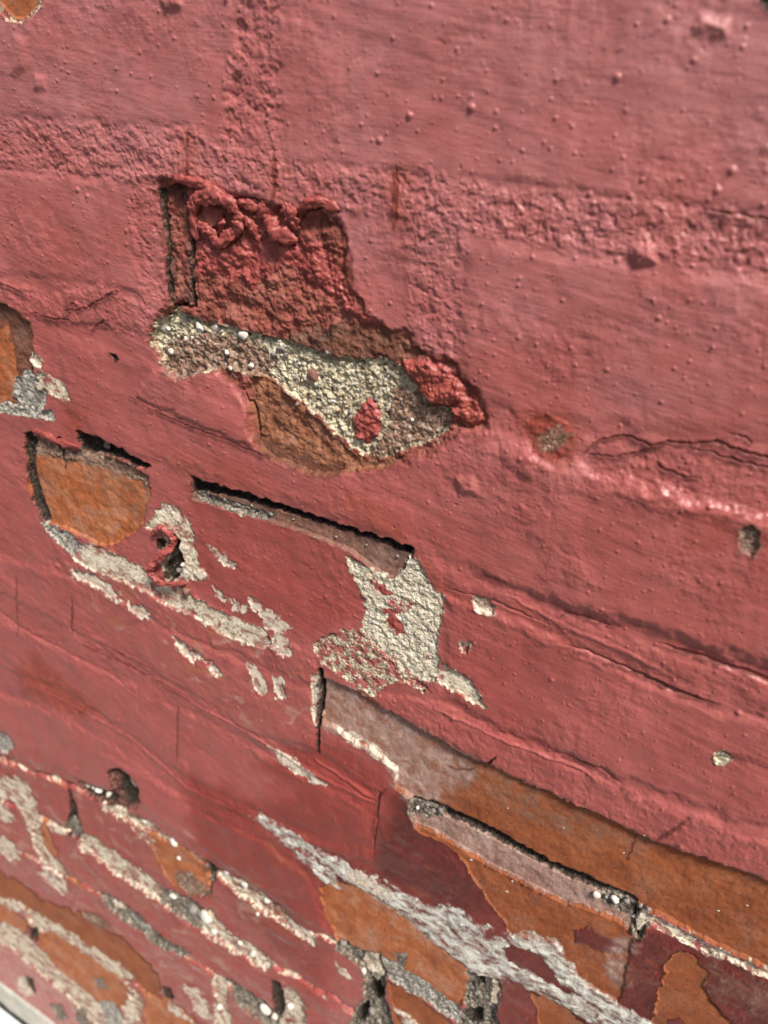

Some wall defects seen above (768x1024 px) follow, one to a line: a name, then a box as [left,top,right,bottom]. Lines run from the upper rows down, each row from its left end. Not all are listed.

spalling [148,173,489,477]
spalling [0,303,293,658]
crack [191,476,415,579]
peeling [527,416,574,463]
crack [585,434,768,480]
peeling [738,525,763,559]
peeling [172,636,223,679]
peeling [246,662,287,701]
crack [310,668,327,753]
peeling [312,549,768,1024]
peeling [0,775,221,1024]
crack [373,790,651,939]